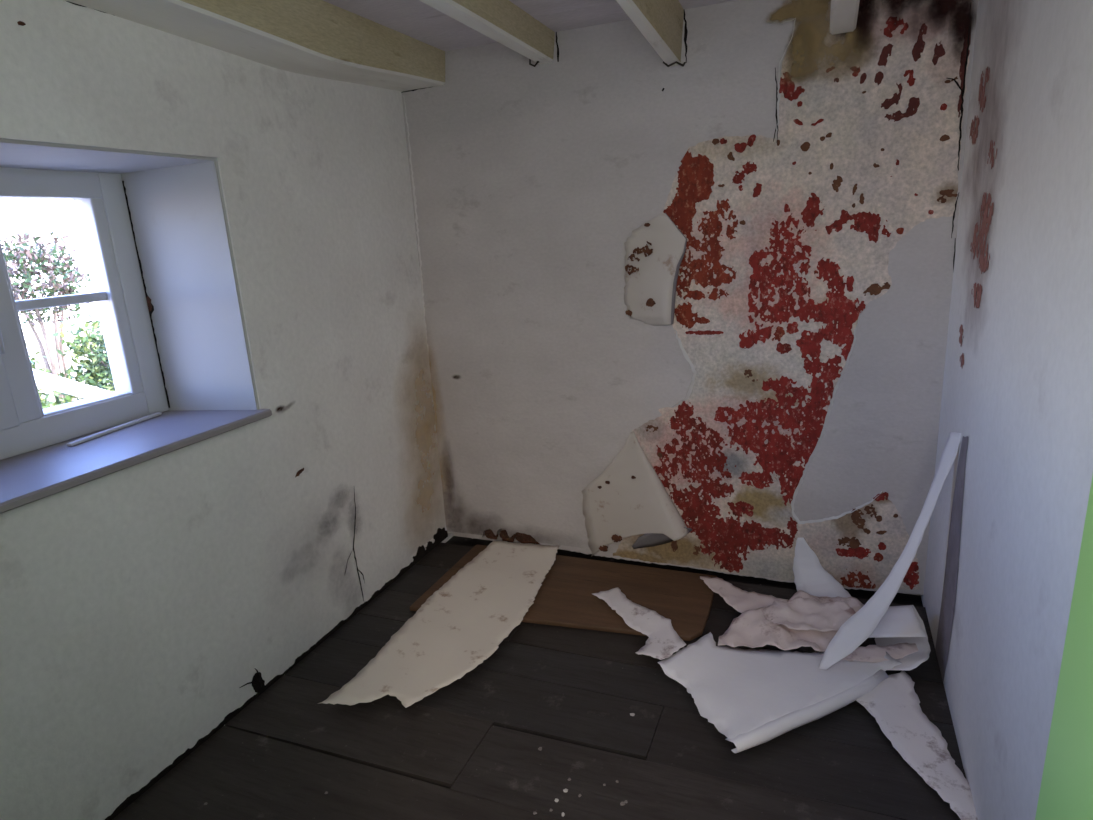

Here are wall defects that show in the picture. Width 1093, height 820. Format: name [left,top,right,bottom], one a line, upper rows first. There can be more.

leakage [769,0,974,78]
peeling [613,0,971,590]
peeling [935,436,968,681]